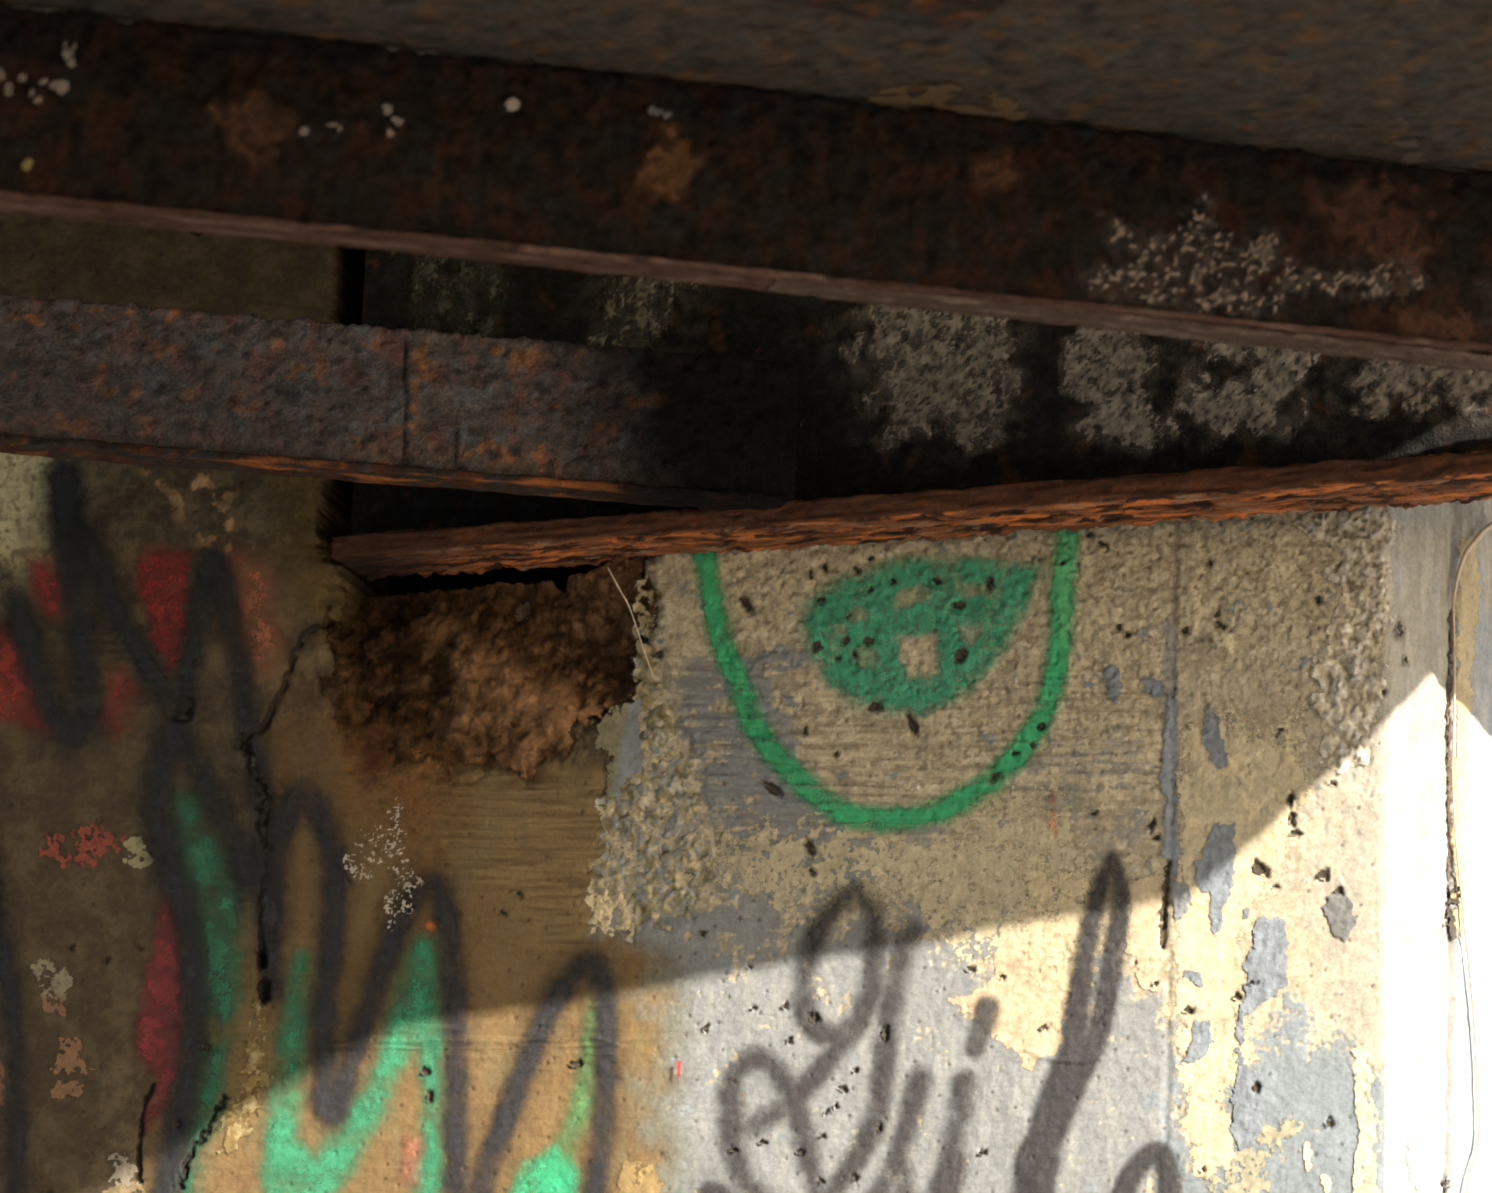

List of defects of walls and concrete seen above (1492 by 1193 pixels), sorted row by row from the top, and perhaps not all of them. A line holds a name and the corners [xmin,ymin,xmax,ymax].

corrosion [635,121,708,202]
efflorescence [1084,191,1430,321]
corrosion [1305,172,1439,297]
leakage [838,304,1022,454]
leakage [1058,326,1321,457]
leakage [1348,359,1492,420]
crack [234,623,327,951]
spalling [319,555,1336,1193]
peeling [1317,869,1358,942]
peeling [1350,1041,1380,1193]